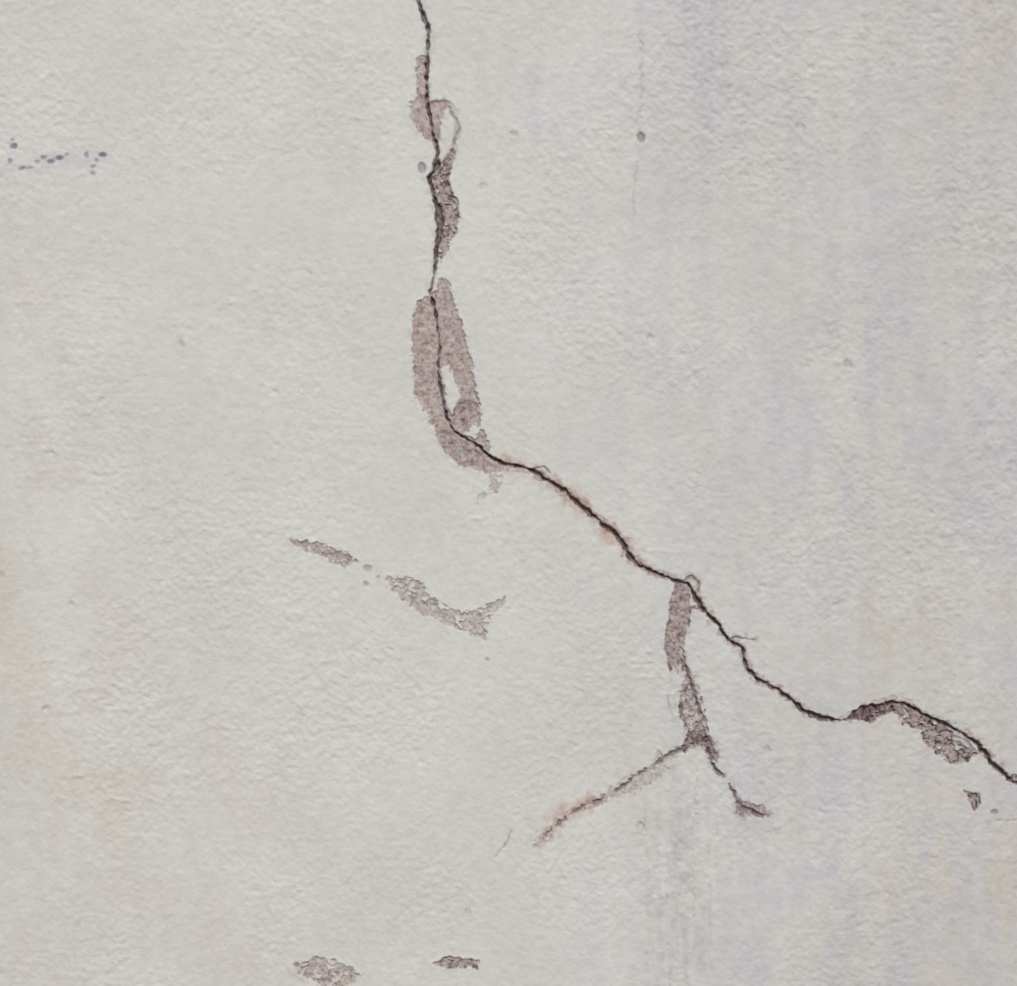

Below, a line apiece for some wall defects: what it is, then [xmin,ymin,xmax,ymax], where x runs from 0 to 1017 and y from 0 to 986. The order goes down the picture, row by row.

peeling [406,54,463,264]
spalling [409,277,504,502]
crack [412,0,1017,850]
spalling [287,537,506,642]
spalling [856,707,978,768]
peeling [962,789,1017,823]
peeling [292,955,362,986]
peeling [431,955,481,972]